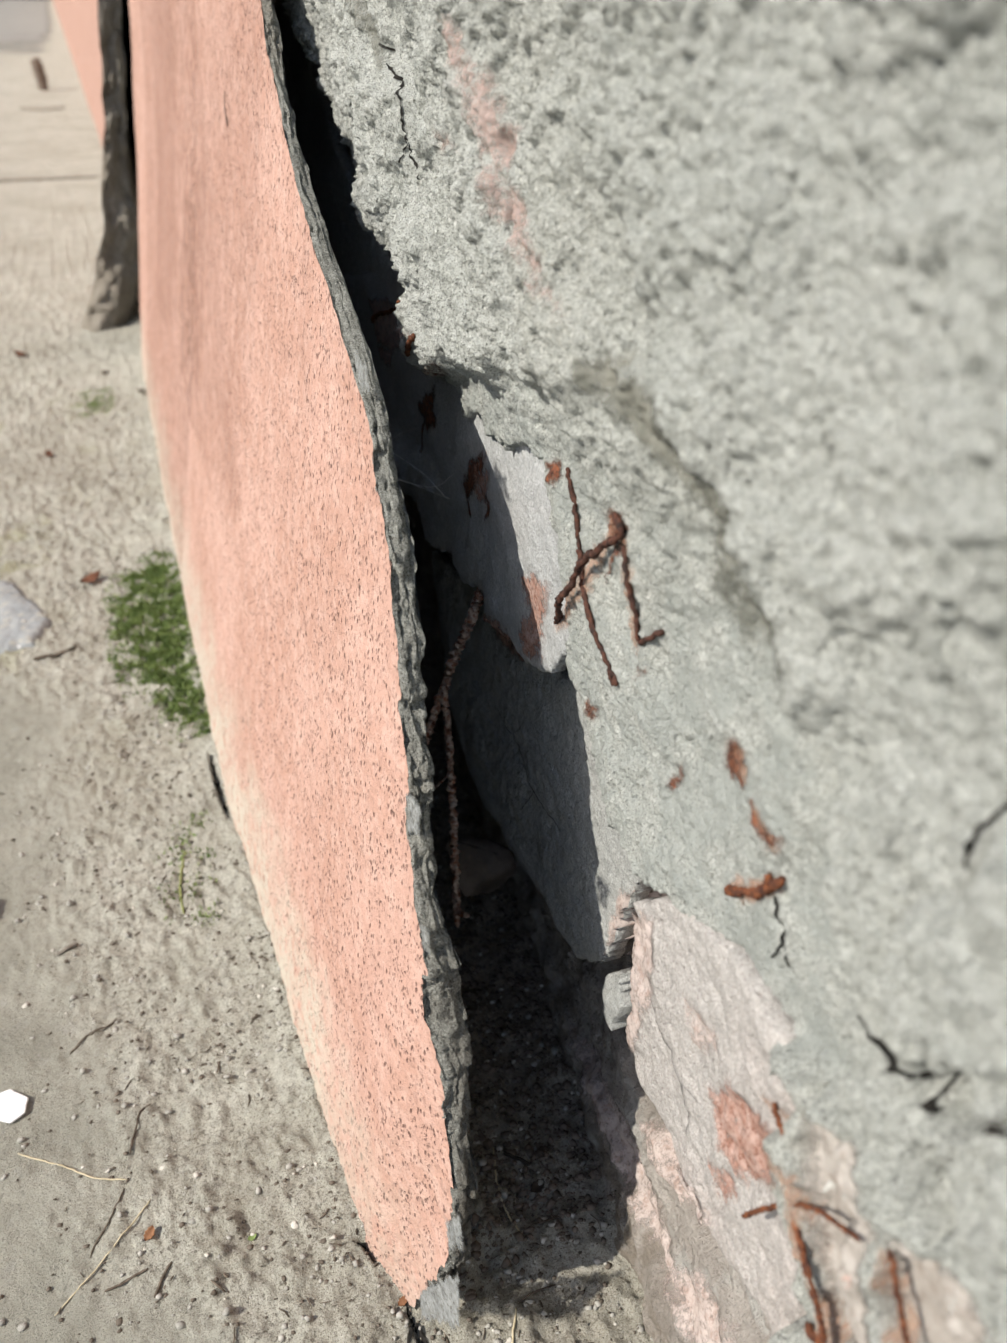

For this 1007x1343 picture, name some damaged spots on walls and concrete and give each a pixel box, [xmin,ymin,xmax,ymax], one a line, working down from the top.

crack [378,43,420,180]
rust [545,458,561,484]
rust [556,507,639,644]
rust [585,699,598,719]
spalling [261,0,1007,1343]
rust [668,766,684,789]
rust [725,738,784,849]
crack [963,801,1007,869]
crack [856,1014,963,1120]
crack [975,1119,1007,1137]
rust [804,1280,851,1343]
rust [872,1254,920,1343]